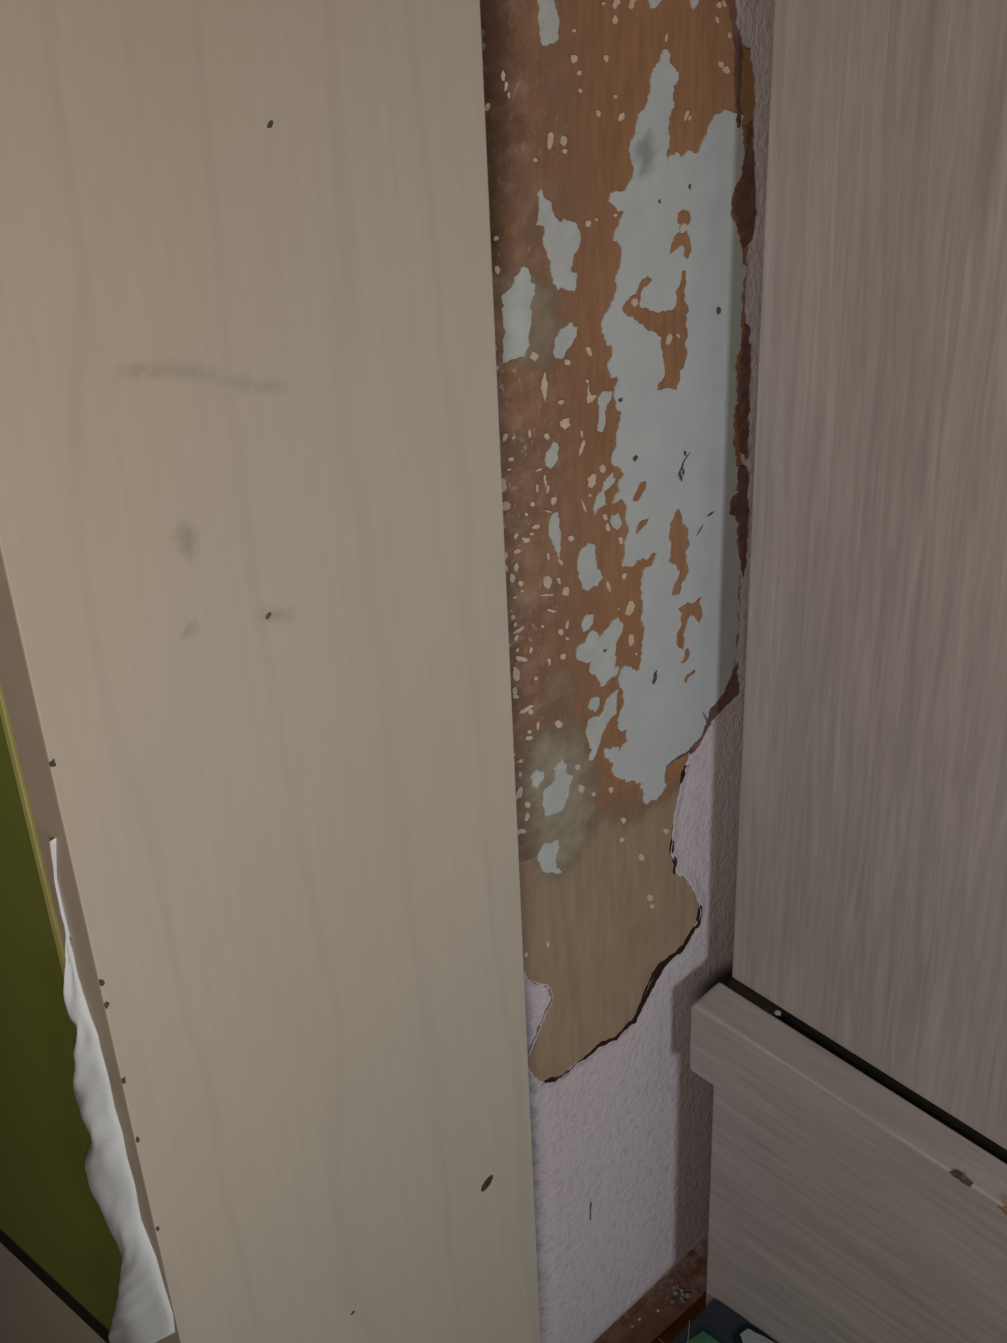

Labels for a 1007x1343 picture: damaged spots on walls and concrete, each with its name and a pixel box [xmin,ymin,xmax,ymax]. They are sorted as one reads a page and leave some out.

peeling [537,0,576,46]
peeling [602,0,661,24]
peeling [494,33,756,835]
peeling [537,840,562,874]